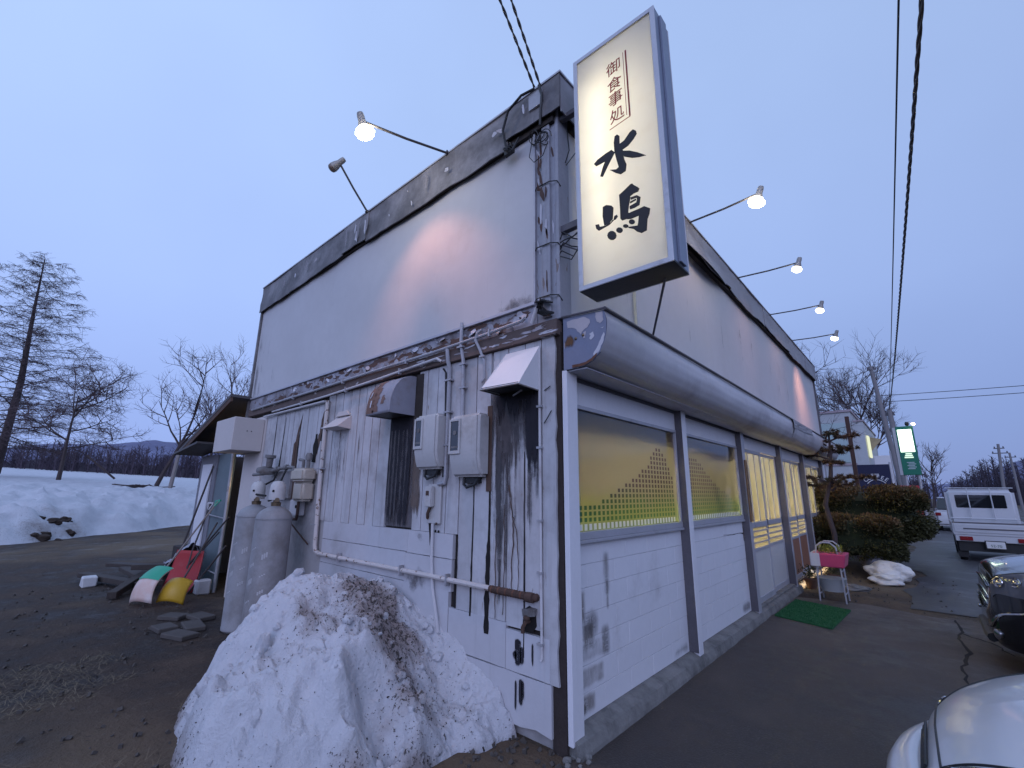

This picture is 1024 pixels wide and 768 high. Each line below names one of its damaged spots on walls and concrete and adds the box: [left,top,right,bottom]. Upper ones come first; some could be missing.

peeling [275,311,605,402]
damp [491,390,539,597]
corrosion [490,585,525,600]
damp [582,601,595,646]
crack [954,620,1014,684]